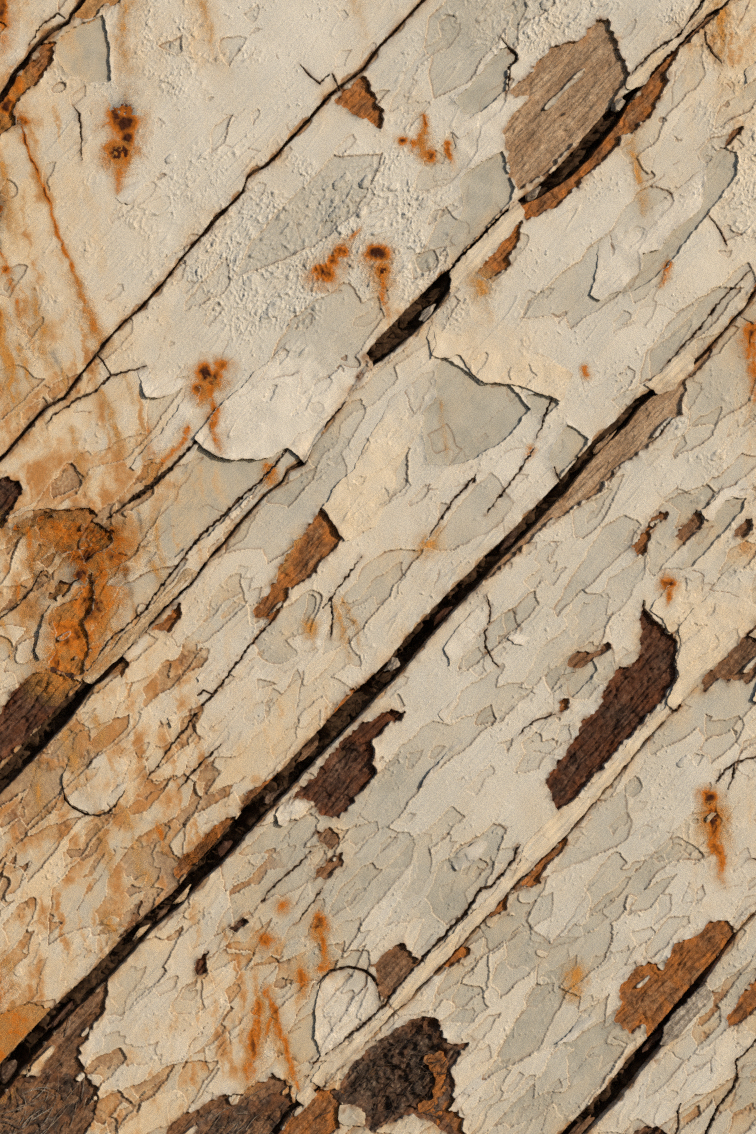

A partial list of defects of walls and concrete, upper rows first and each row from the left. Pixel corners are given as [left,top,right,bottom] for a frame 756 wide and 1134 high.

rust [101,104,141,194]
peeling [433,12,717,279]
rust [309,229,392,316]
rust [191,359,229,450]
rust [0,516,137,695]
crack [87,441,287,671]
crack [148,619,275,776]
peeling [546,479,756,810]
peeling [275,709,404,879]
crack [313,846,519,1064]
peeling [0,980,107,1134]
crack [674,1039,756,1134]